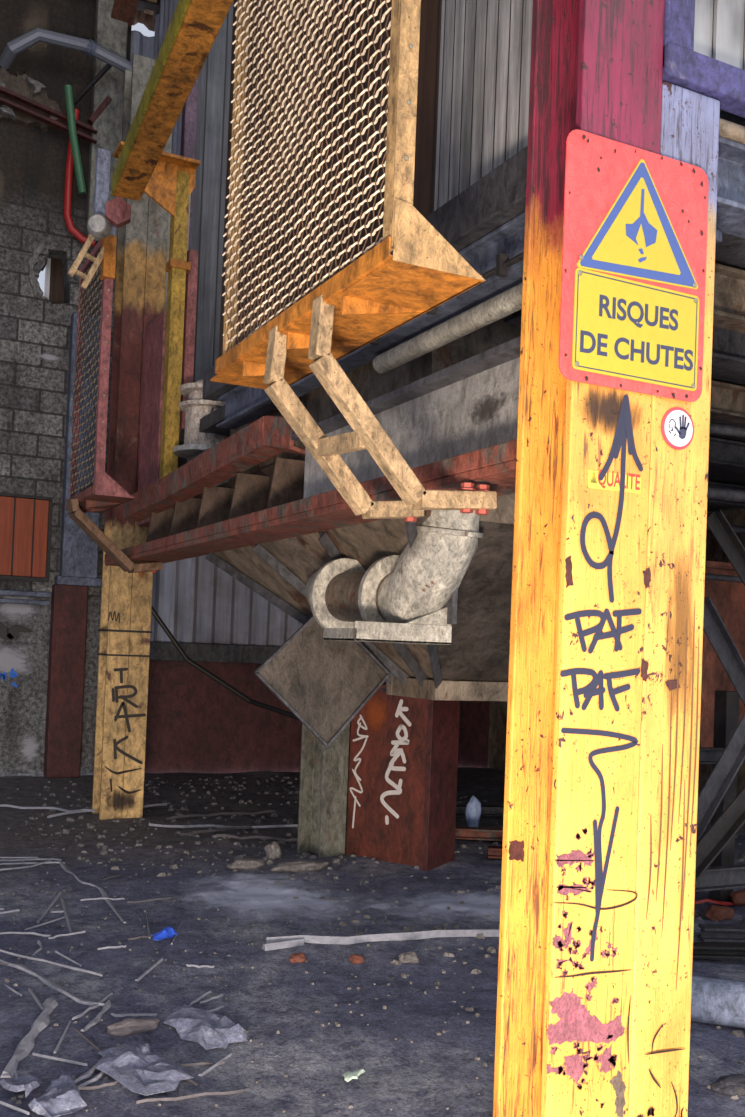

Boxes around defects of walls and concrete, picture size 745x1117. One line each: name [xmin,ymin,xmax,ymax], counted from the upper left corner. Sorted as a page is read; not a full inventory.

spalling [0,68,65,133]
peeling [555,828,595,896]
peeling [546,911,626,1117]